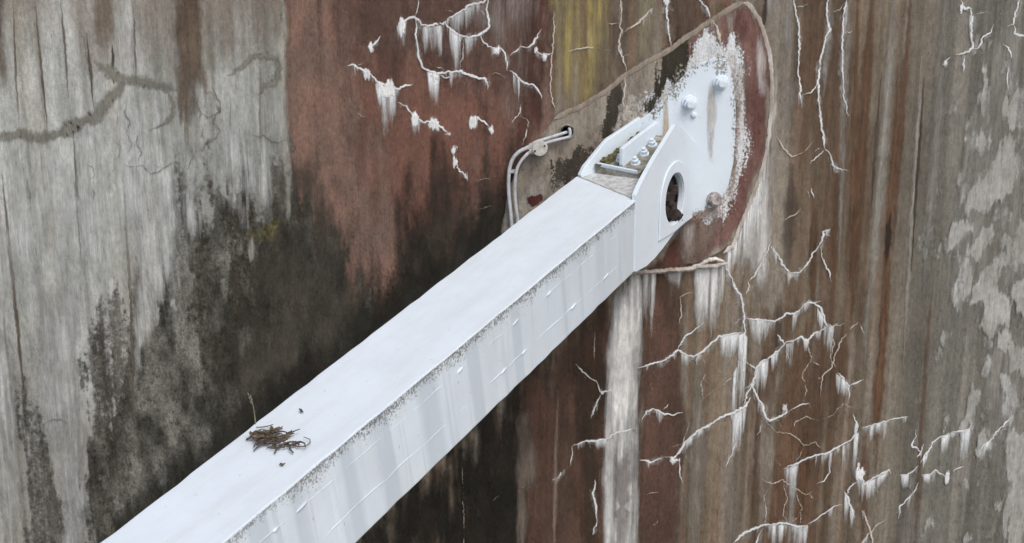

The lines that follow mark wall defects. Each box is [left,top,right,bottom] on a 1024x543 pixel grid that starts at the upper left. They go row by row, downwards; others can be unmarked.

leakage [0,0,514,543]
rust [284,0,555,315]
crack [348,0,593,180]
leakage [573,273,656,543]
rust [636,2,770,543]
crack [553,229,1013,543]
crack [776,0,852,171]
crack [944,0,1024,86]